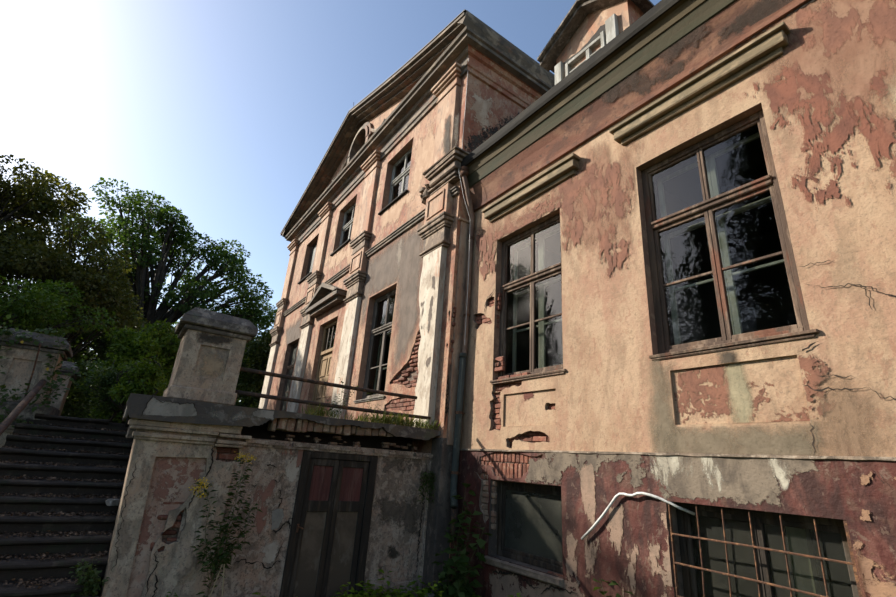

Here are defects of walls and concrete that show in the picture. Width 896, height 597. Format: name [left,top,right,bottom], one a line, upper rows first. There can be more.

peeling [744,0,896,210]
peeling [476,162,633,281]
crack [798,260,896,309]
spalling [385,276,435,412]
spalling [492,356,534,430]
peeling [674,365,733,424]
crack [804,374,896,400]
crack [110,464,136,574]
crack [186,445,214,510]
spalling [241,410,418,483]
peeling [478,431,819,597]
crack [145,551,159,597]